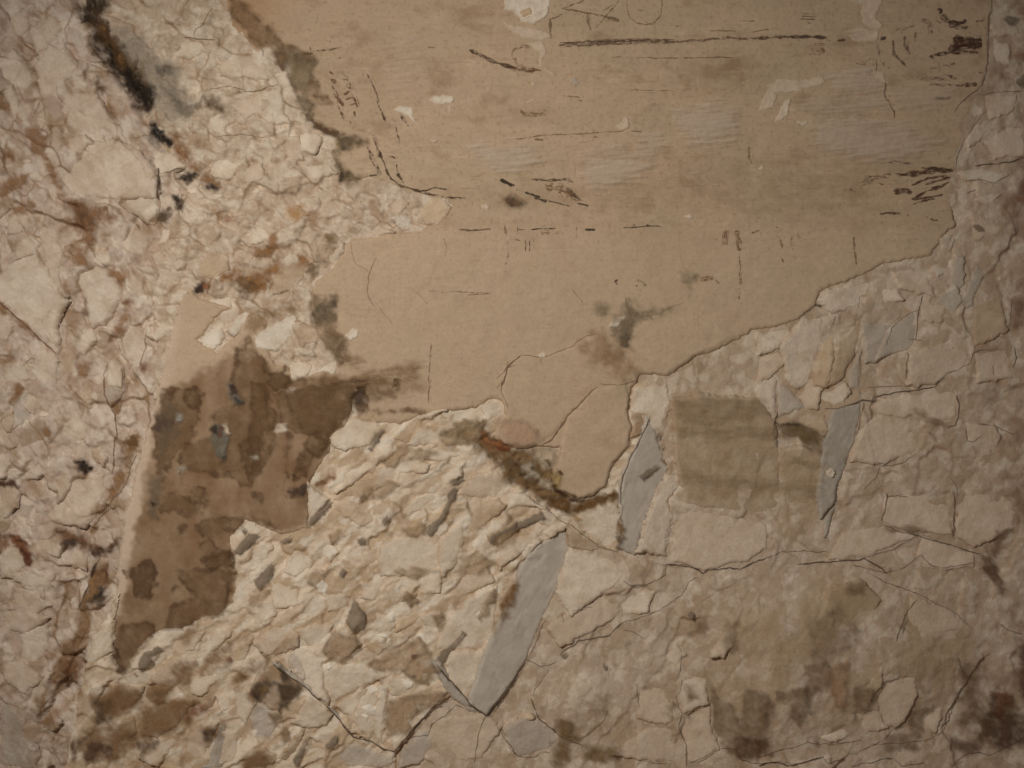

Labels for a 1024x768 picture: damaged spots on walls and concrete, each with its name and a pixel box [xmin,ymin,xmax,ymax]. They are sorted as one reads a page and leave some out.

damp [82,0,223,189]
crack [125,168,182,227]
damp [158,196,182,222]
spalling [0,0,454,768]
damp [206,339,432,497]
rust [439,420,618,521]
spalling [64,227,1024,768]
crack [542,379,650,552]
damp [776,422,820,445]
crack [826,295,1017,442]
crack [276,454,990,767]
damp [84,641,232,762]